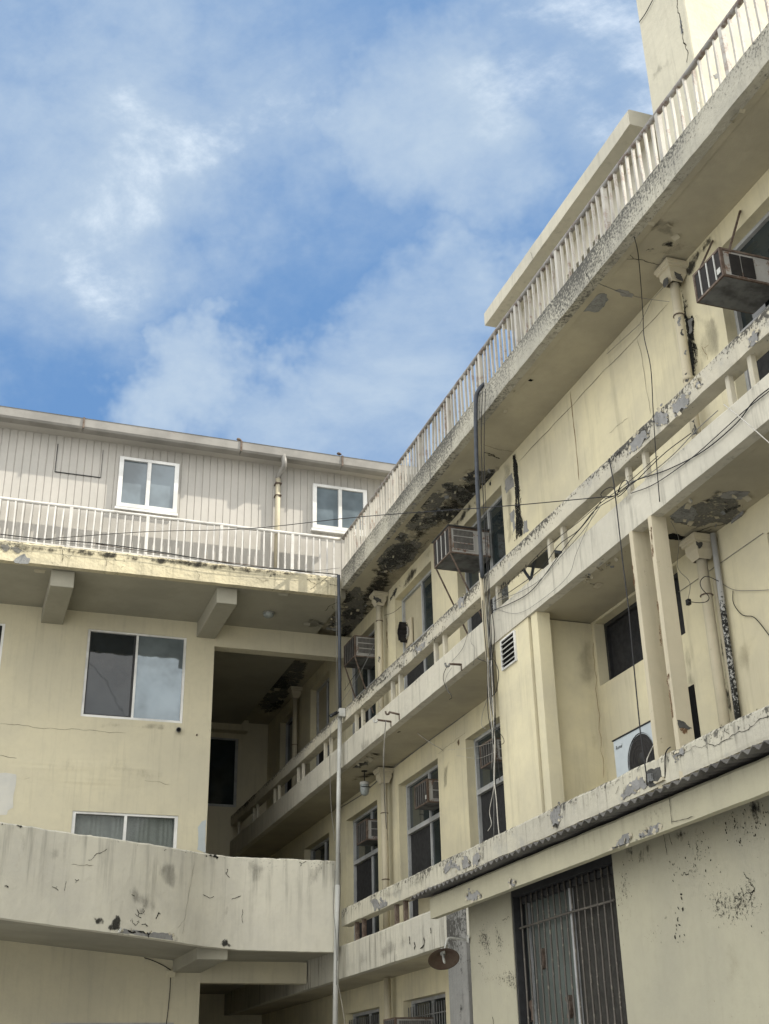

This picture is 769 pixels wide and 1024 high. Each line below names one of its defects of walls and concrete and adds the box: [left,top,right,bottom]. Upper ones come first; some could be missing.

crack [677,1,696,73]
peeling [629,373,703,454]
water stain [396,473,491,556]
water stain [505,455,529,539]
peeling [668,491,752,549]
water stain [69,549,137,560]
water stain [151,558,290,574]
water stain [353,566,416,620]
crack [679,716,769,758]
peeling [621,767,665,800]
peeling [549,802,563,829]
peeling [118,928,174,940]